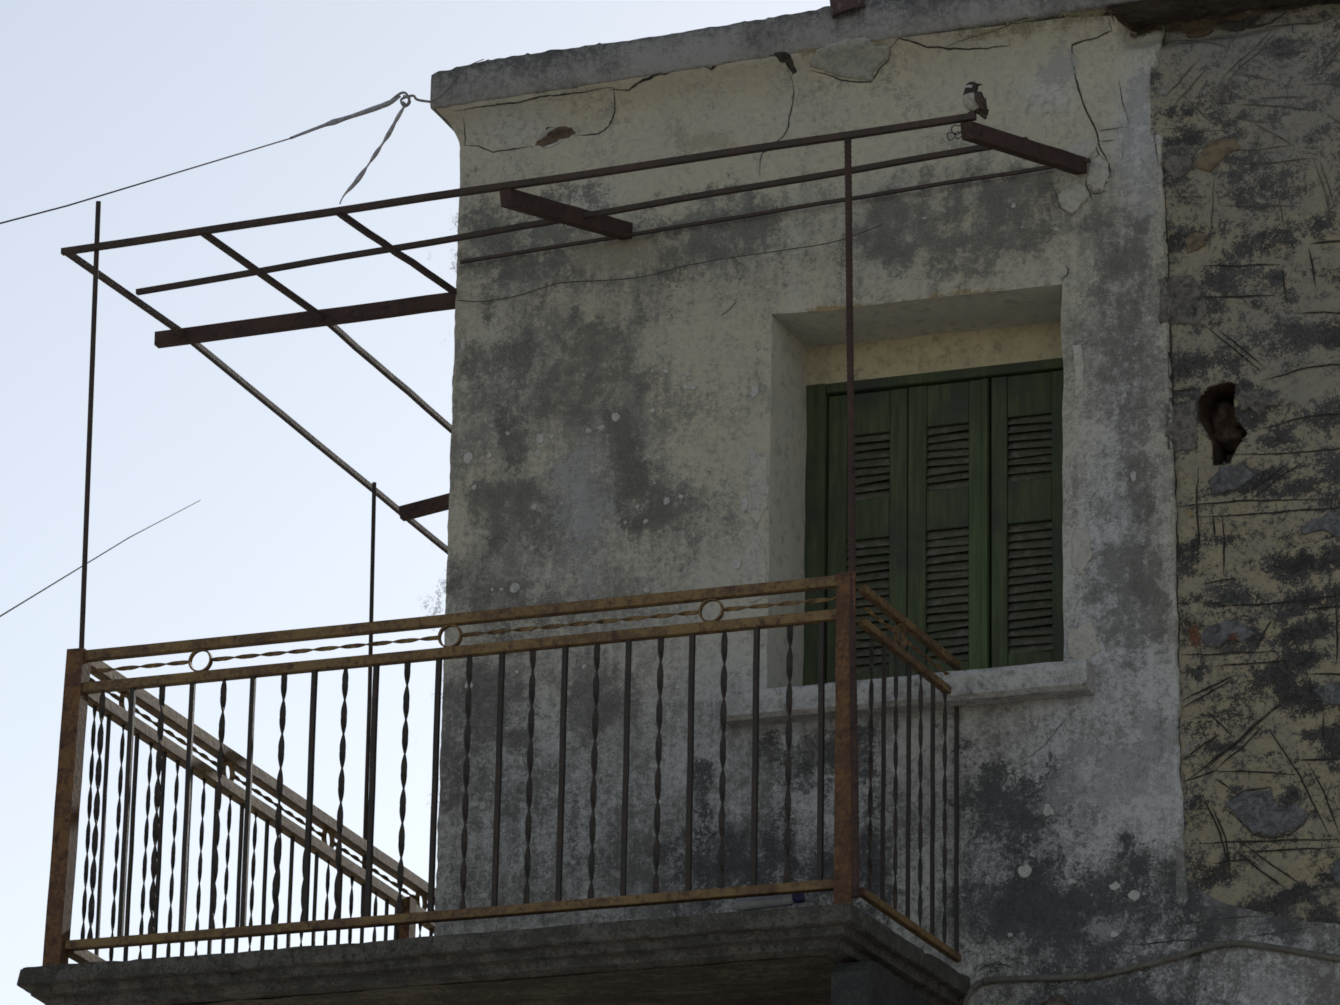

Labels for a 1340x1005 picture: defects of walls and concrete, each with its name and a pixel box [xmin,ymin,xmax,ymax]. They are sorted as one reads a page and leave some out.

flaking render [535,126,576,148]
crack [458,71,672,153]
crack [759,55,794,174]
peeling [774,37,891,83]
peeling [1048,140,1110,216]
crack [1071,9,1174,406]
damp [424,173,804,808]
damp [833,68,1173,671]
spalling [1165,381,1262,498]
crack [1170,438,1182,781]
damp [651,723,835,917]
damp [936,709,1340,1005]